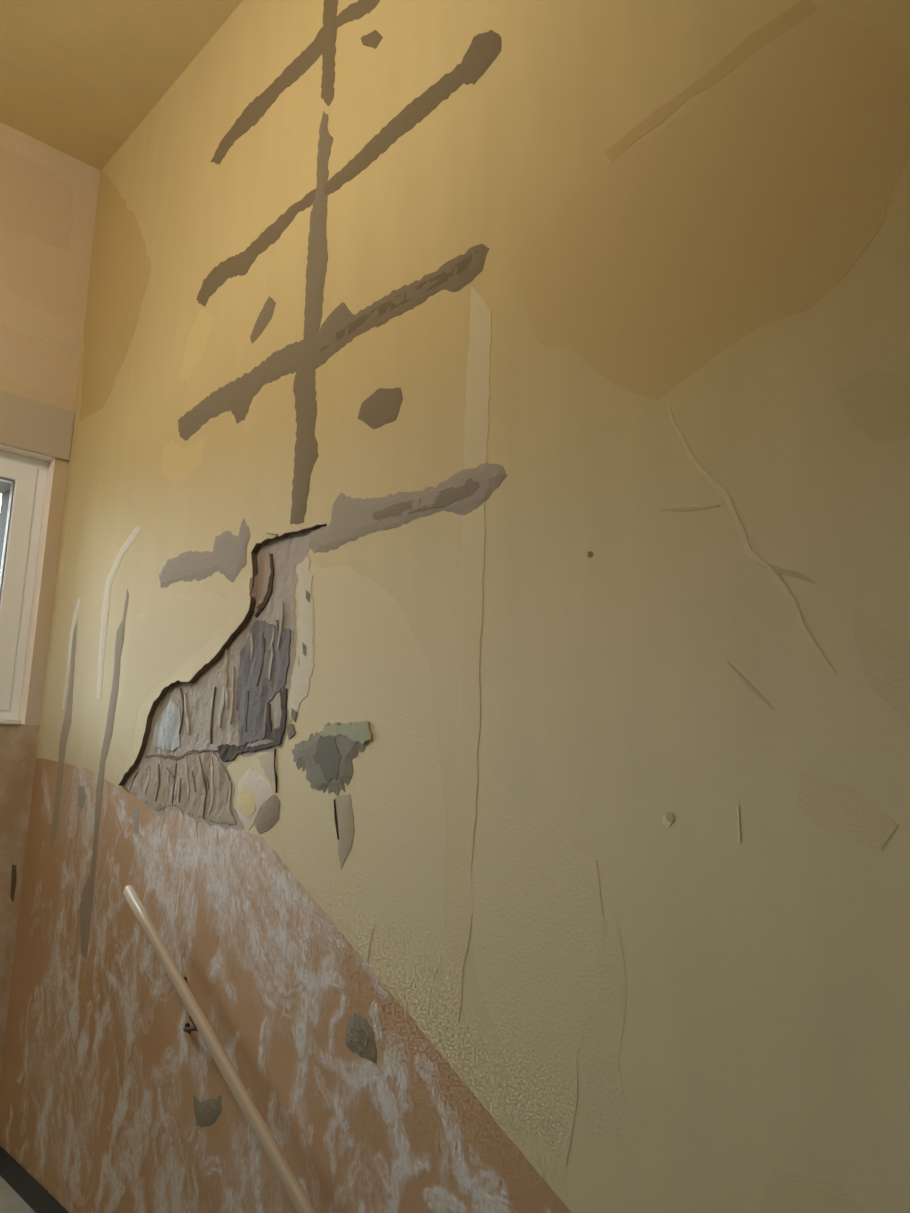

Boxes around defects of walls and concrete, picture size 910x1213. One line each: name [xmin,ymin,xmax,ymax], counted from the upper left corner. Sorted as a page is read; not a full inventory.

flaking render [119,524,327,830]